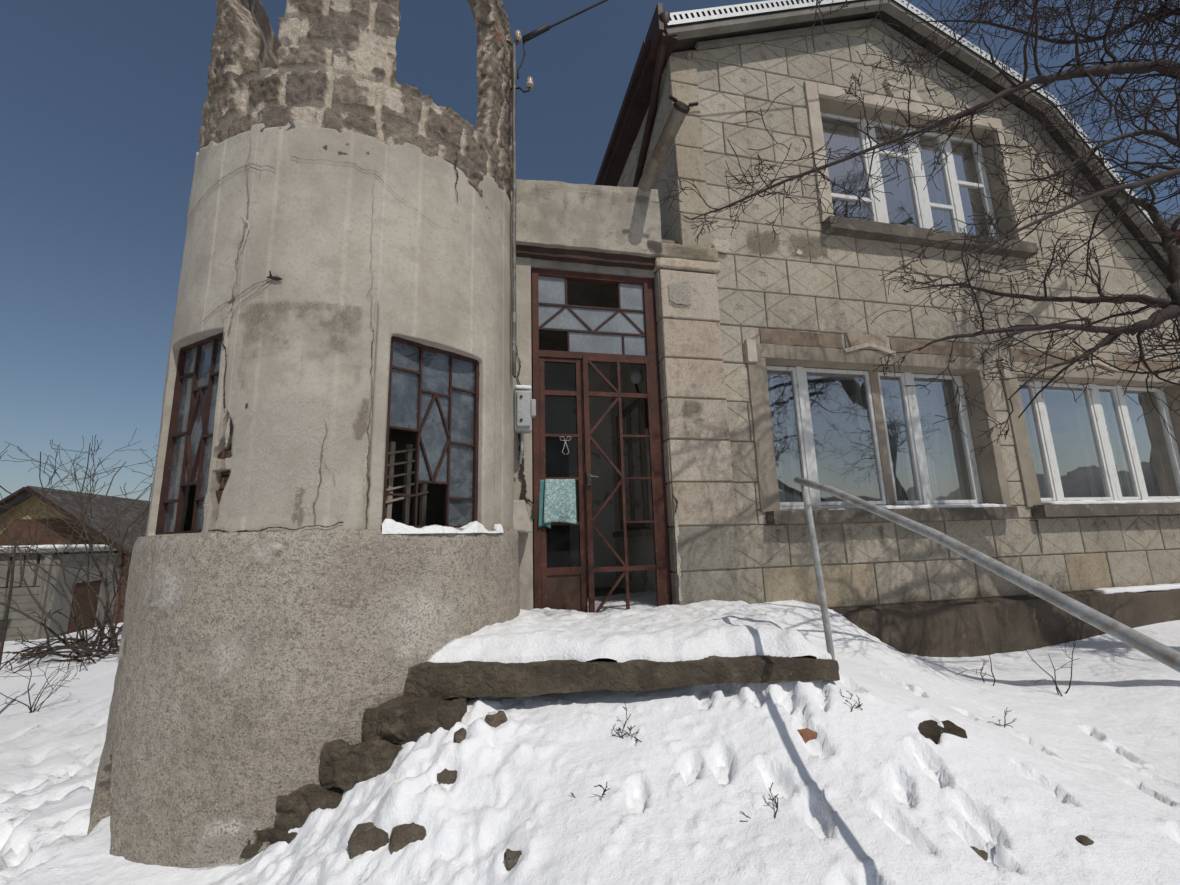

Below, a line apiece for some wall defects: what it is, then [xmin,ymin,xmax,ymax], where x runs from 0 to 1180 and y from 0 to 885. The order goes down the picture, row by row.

crack [185,134,434,533]